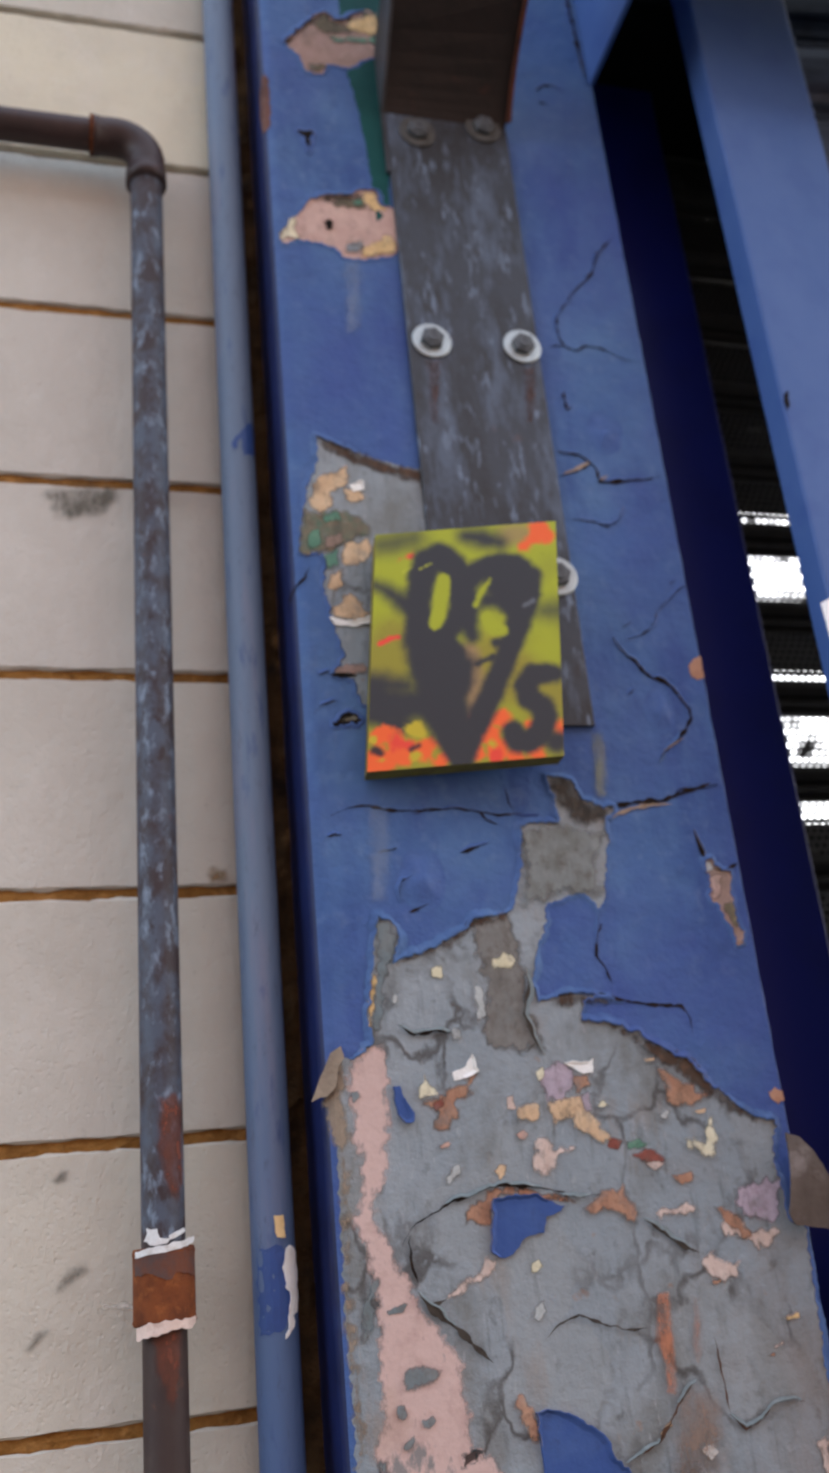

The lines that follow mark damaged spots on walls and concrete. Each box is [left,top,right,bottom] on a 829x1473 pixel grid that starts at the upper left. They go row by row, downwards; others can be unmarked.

peeling [279,9,377,76]
peeling [276,187,398,263]
crack [558,450,661,528]
peeling [295,430,426,730]
crack [602,581,718,822]
crack [694,829,738,871]
corrosion [160,1094,182,1195]
peeling [312,772,829,1473]
crack [402,1180,600,1363]
crack [644,1218,700,1253]
crack [549,1314,651,1336]
crack [627,1340,805,1464]